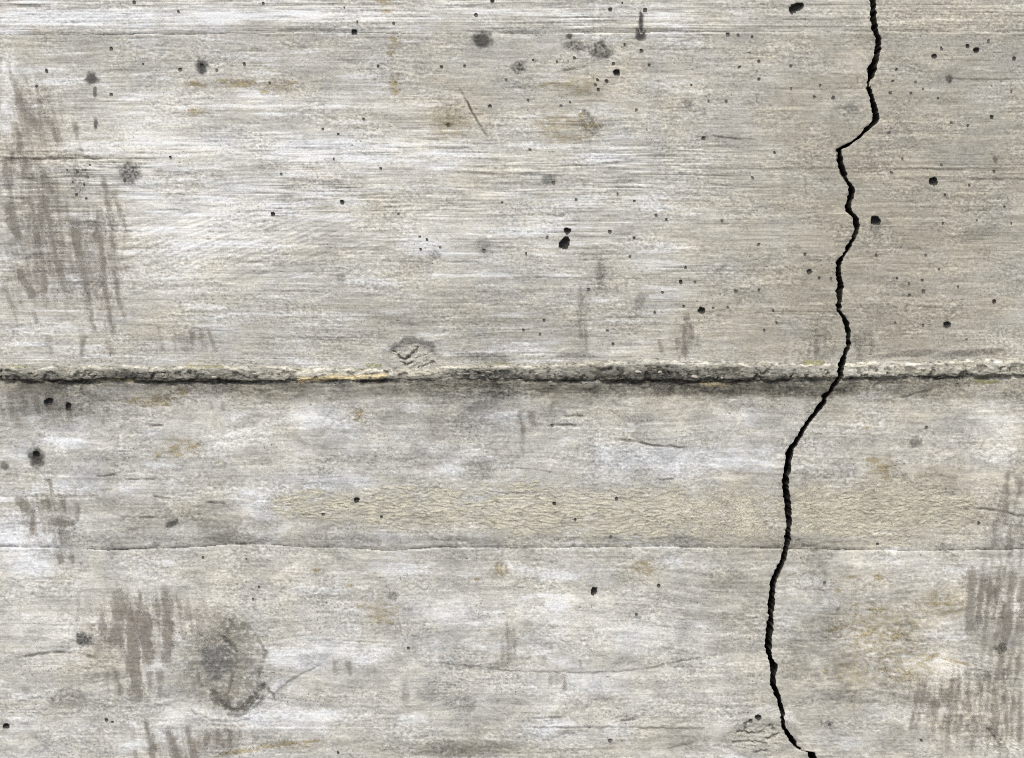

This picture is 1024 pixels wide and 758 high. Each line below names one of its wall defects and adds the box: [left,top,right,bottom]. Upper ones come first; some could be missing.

crack [764,0,882,758]